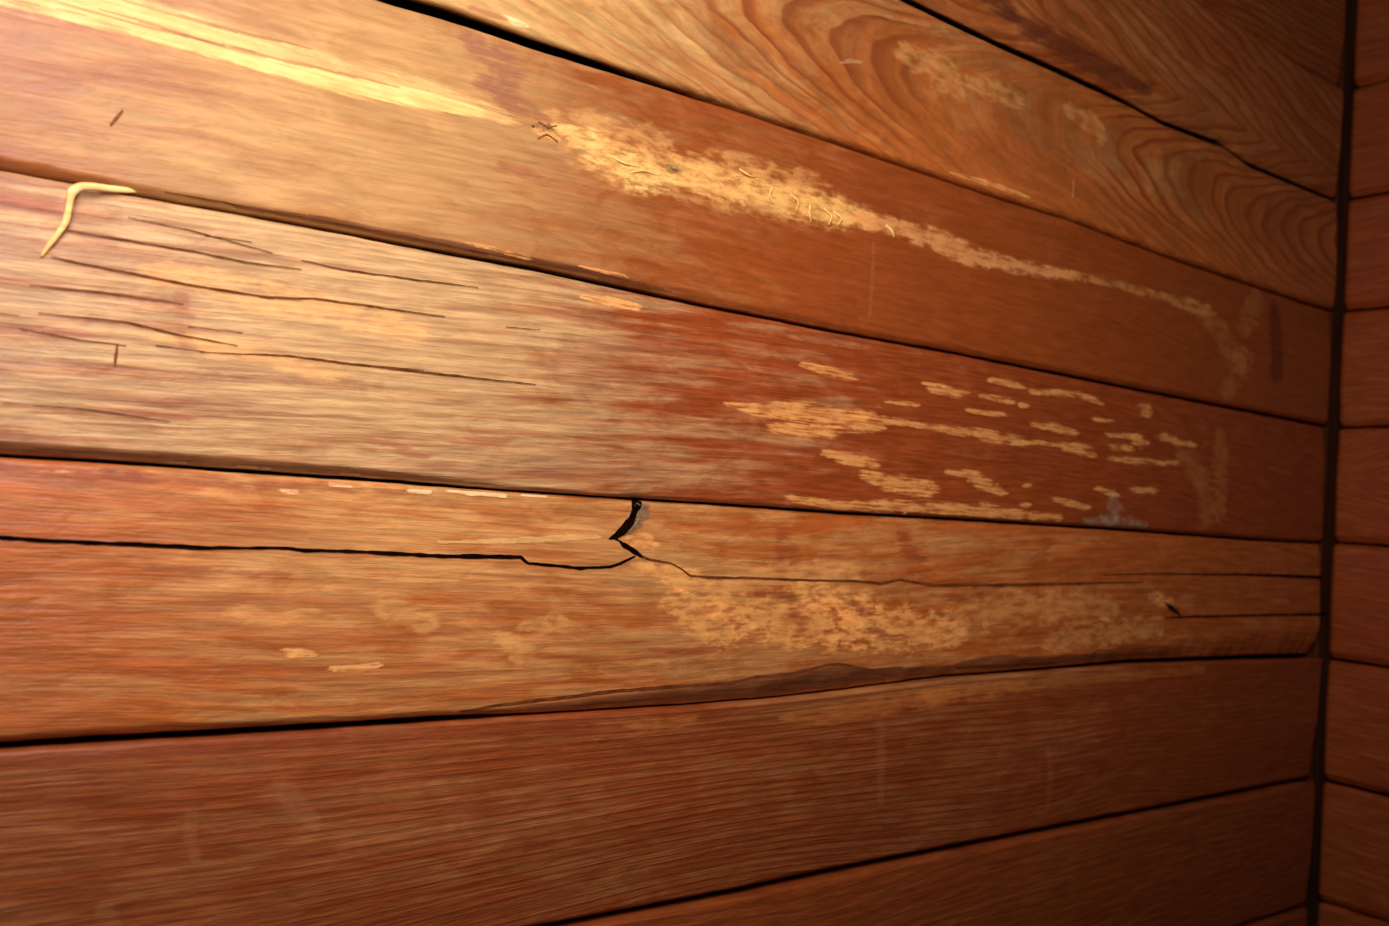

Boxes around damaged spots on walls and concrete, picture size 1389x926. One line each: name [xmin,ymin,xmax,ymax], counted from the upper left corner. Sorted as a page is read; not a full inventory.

crack [0,500,1321,586]
crack [1166,611,1328,619]